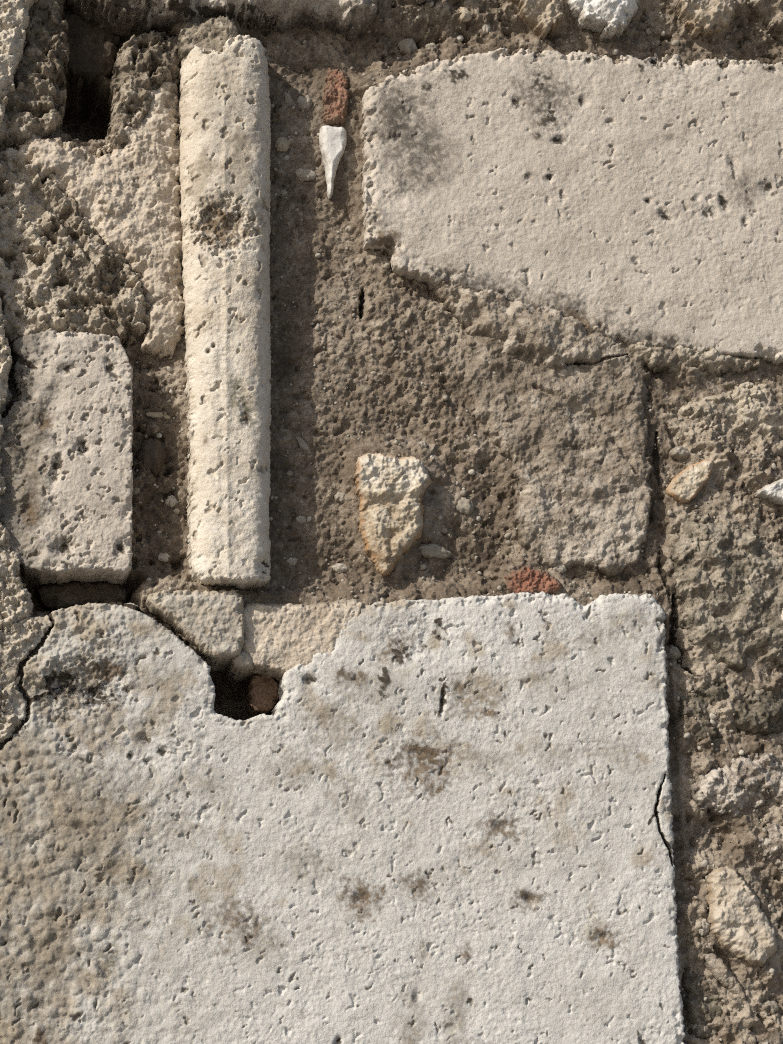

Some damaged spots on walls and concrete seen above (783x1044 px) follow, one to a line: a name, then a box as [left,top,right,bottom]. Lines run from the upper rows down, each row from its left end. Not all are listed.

crack [652,432,662,485]
crack [656,546,700,677]
crack [0,613,59,750]
crack [648,774,672,864]